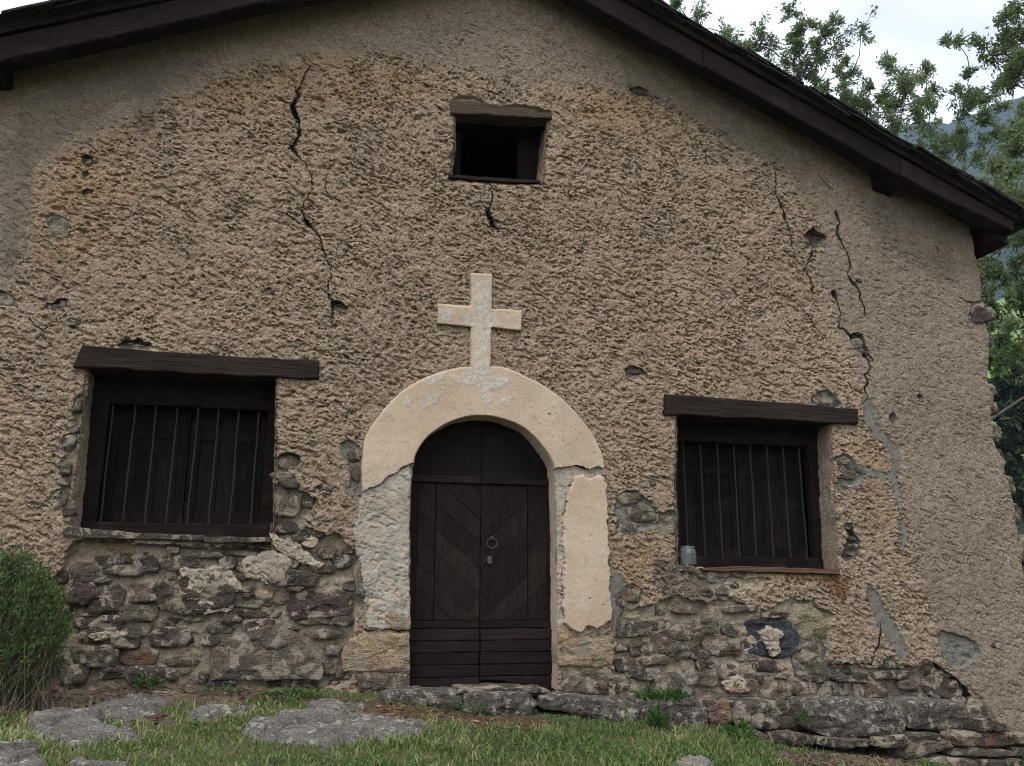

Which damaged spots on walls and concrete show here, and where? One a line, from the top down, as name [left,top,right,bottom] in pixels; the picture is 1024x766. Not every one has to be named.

crack [288,66,347,326]
crack [486,184,503,232]
flaking render [804,227,827,248]
crack [772,162,873,402]
flaking render [968,300,996,326]
flaking render [56,390,86,522]
flaking render [833,453,867,492]
flaking render [614,476,677,538]
flaking render [22,438,411,693]
flaking render [841,522,861,561]
flaking render [610,567,1004,720]